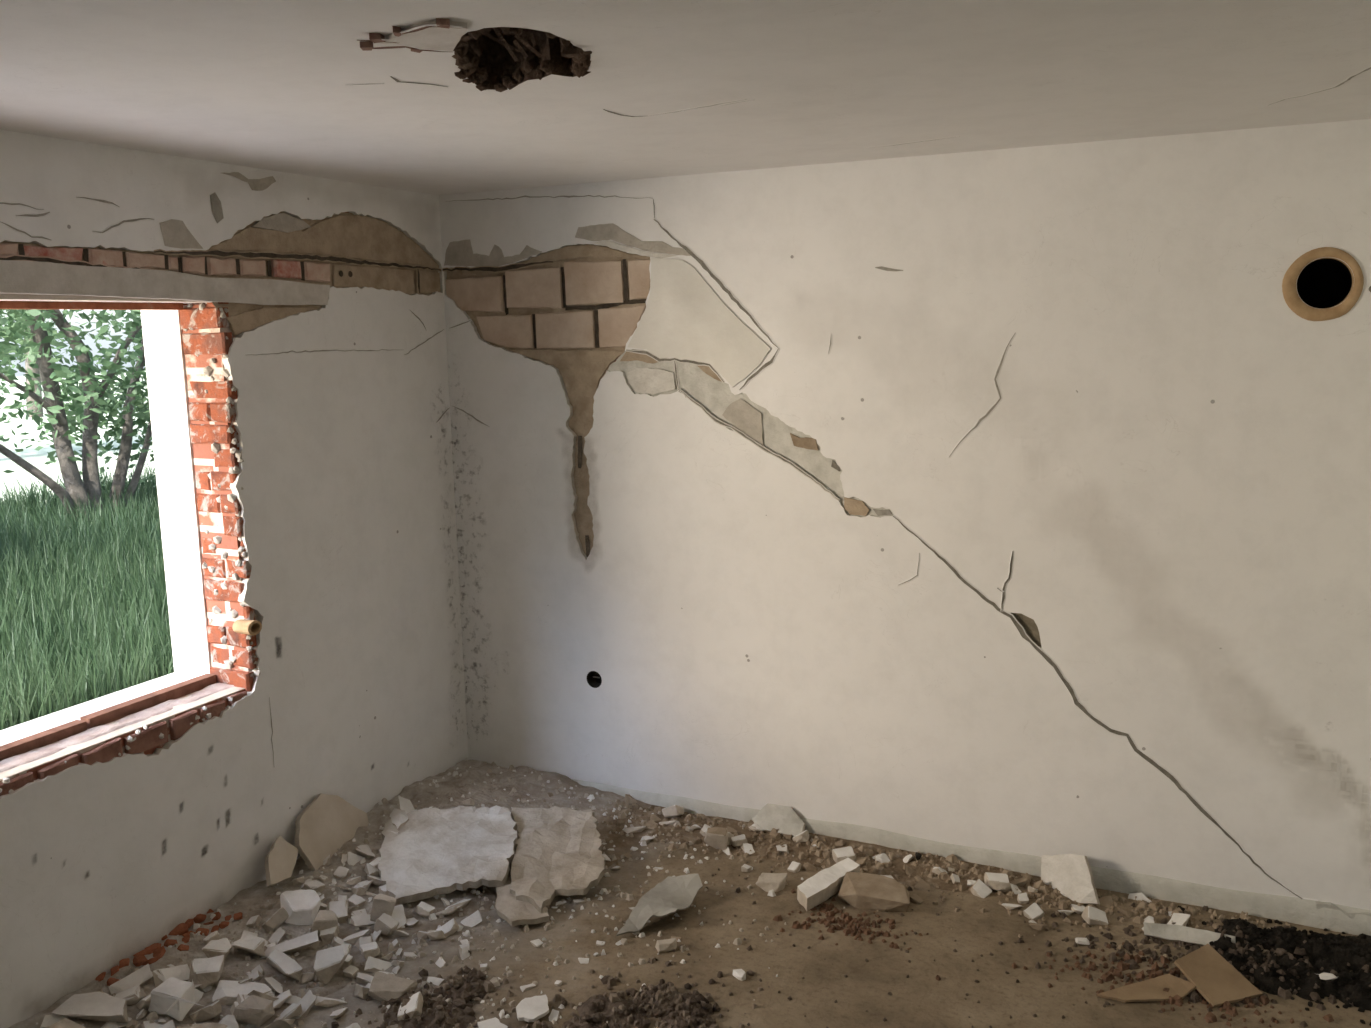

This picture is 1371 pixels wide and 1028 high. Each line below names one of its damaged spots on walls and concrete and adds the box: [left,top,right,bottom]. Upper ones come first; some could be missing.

flaking render [357,18,467,53]
peeling [222,172,276,191]
peeling [210,192,224,223]
crack [875,265,903,273]
crack [825,334,833,354]
spalling [0,211,893,557]
crack [948,332,1017,458]
crack [893,515,1318,901]